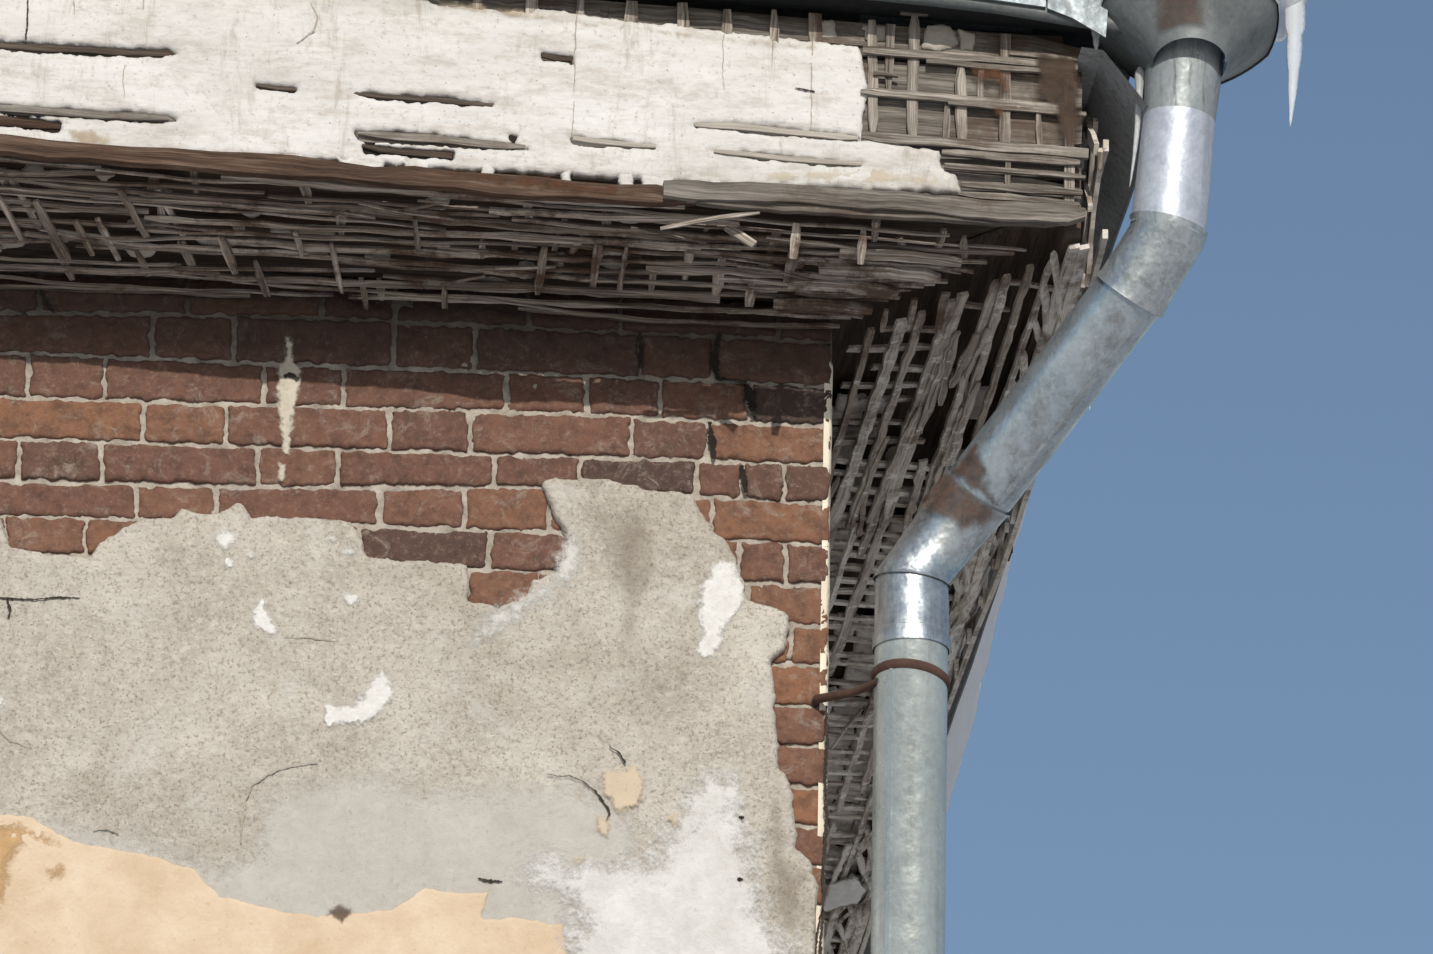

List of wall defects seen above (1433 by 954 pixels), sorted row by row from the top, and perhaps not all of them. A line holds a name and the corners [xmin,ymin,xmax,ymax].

spalling [695,12,1089,206]
crack [0,596,80,618]
spalling [0,256,866,954]
crack [547,774,611,820]